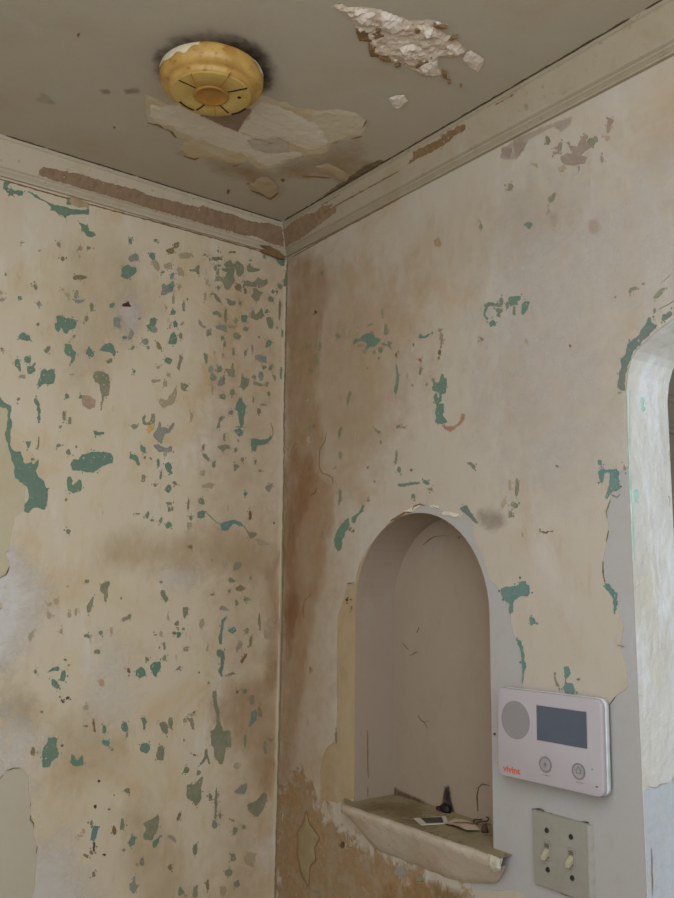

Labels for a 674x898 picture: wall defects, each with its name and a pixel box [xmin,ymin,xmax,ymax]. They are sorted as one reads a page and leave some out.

flaking render [331,4,484,88]
flaking render [145,94,367,182]
peeling [408,124,466,164]
peeling [544,117,614,175]
peeling [3,167,337,533]
peeling [617,287,673,394]
peeling [220,508,270,547]
peeling [34,658,71,703]
peeling [57,581,110,635]
peeling [84,614,131,654]
peeling [206,558,280,677]
peeling [389,450,674,898]